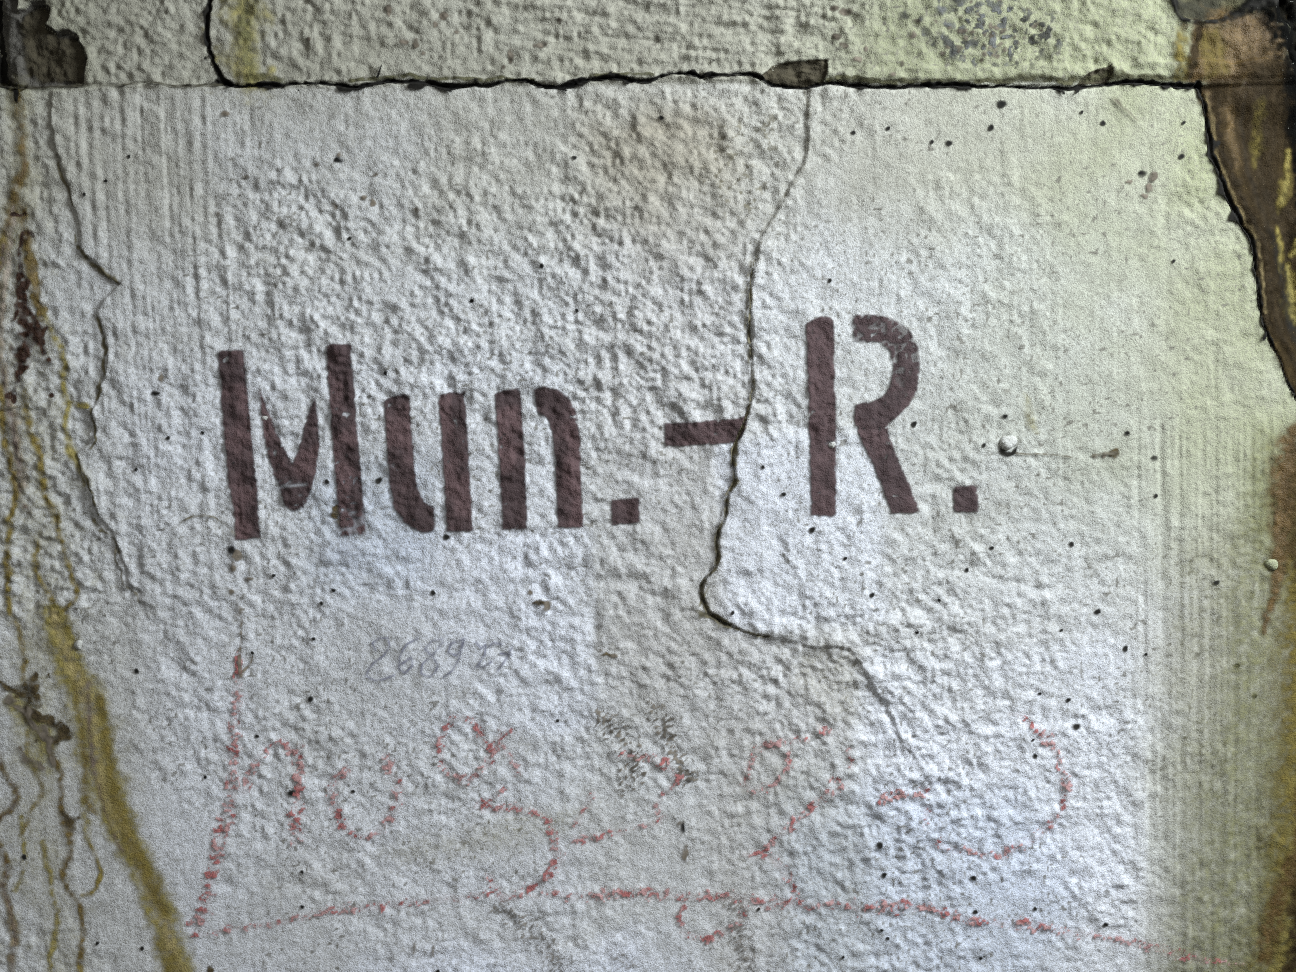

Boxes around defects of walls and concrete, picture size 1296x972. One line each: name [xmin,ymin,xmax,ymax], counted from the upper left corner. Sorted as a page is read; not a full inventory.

spalling [0,0,87,92]
crack [0,0,1296,399]
spalling [1171,0,1279,23]
rust [1175,0,1296,386]
crack [699,269,770,637]
damp [44,604,193,972]
rust [1219,423,1296,972]